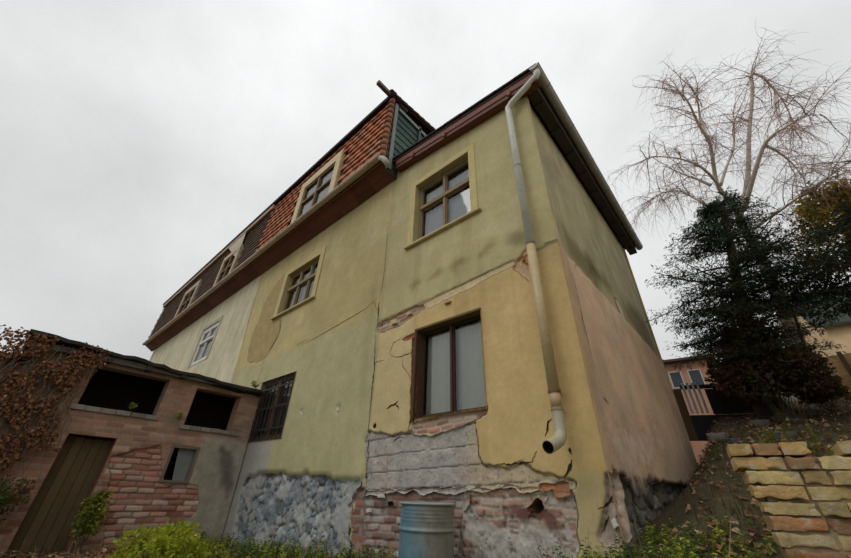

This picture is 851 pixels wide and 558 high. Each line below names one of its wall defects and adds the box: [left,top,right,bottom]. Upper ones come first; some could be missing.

peeling [247,276,285,362]
flaking render [377,248,531,333]
crack [298,231,411,531]
flaking render [103,445,199,551]
flaking render [232,333,580,558]
flaking render [597,469,686,548]